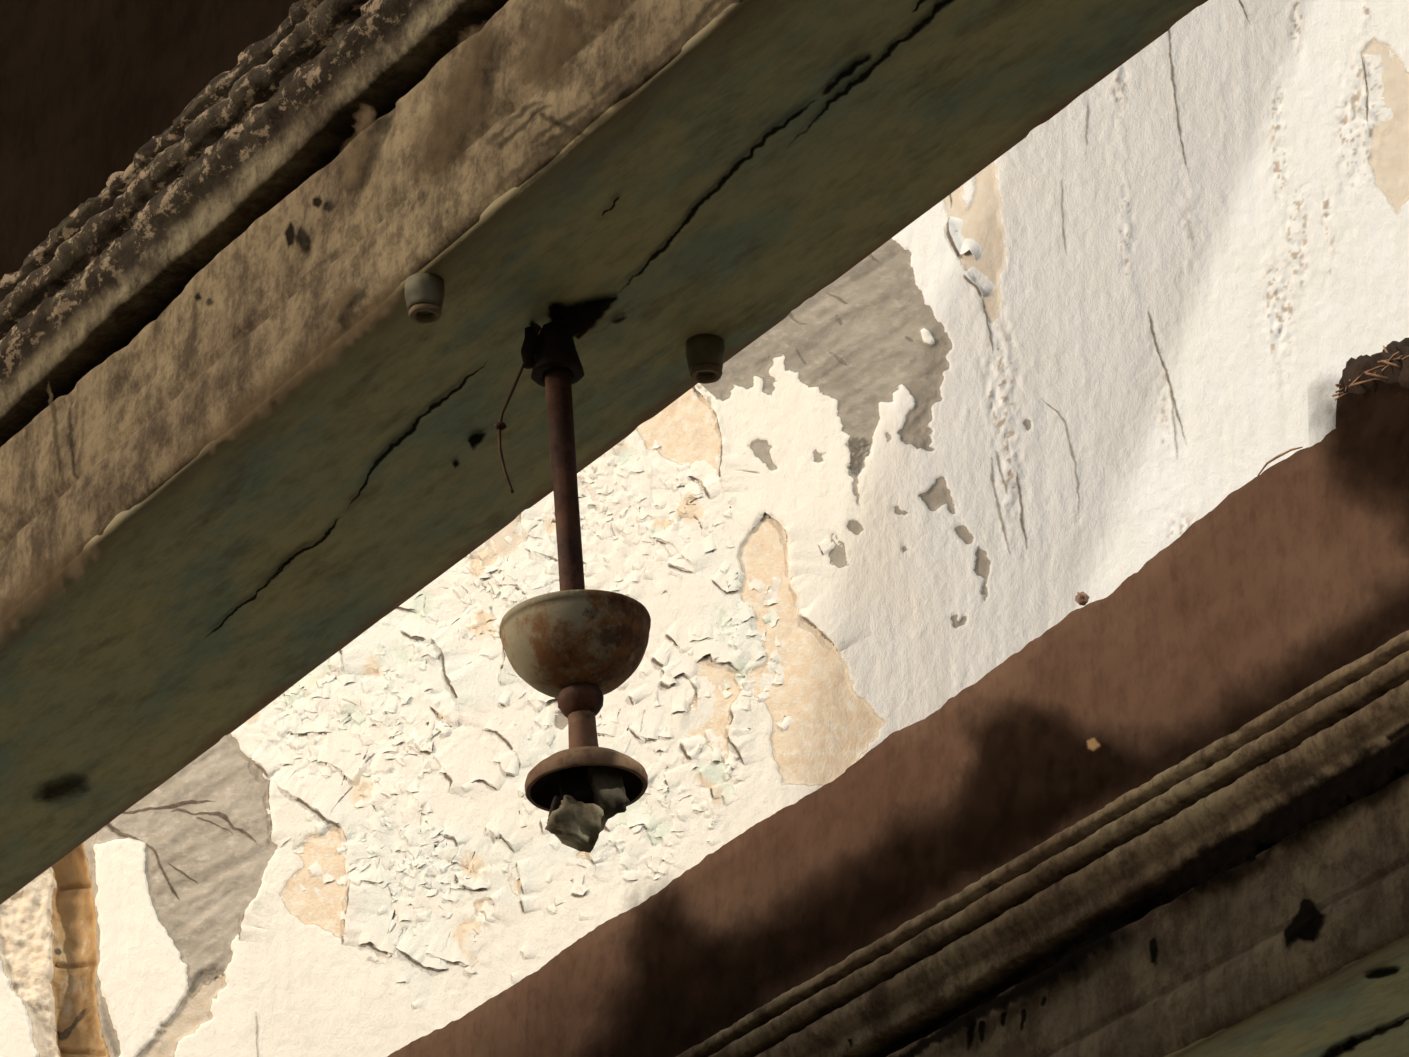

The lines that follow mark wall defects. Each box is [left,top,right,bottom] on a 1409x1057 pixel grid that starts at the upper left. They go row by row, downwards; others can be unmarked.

crack [602,197,619,216]
crack [622,0,955,289]
peeling [944,162,1005,322]
crack [1168,30,1186,165]
peeling [1361,39,1409,214]
crack [206,363,486,637]
spalling [919,476,990,601]
peeling [94,239,952,1057]
spalling [951,615,966,628]
crack [1323,1017,1409,1057]